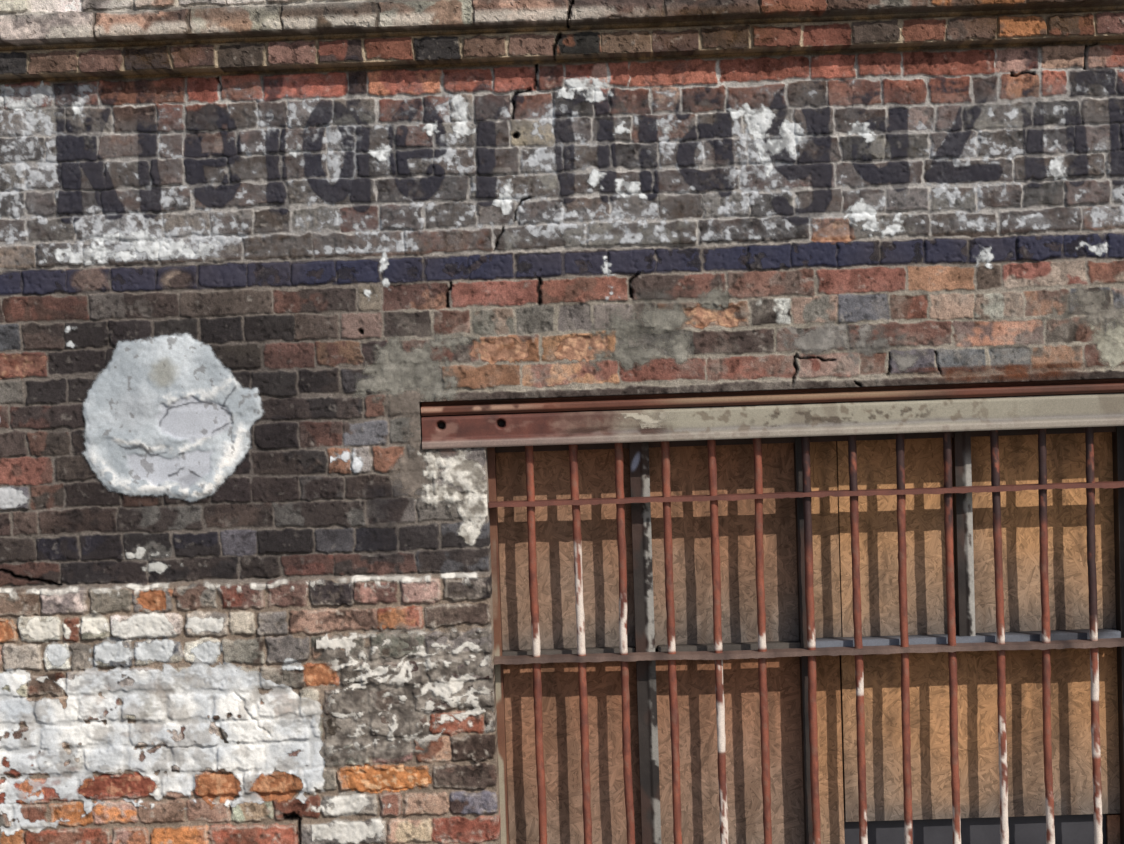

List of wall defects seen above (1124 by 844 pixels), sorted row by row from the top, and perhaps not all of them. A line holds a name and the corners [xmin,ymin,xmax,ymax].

crack [511,0,574,119]
peeling [424,123,439,136]
crack [494,197,531,251]
spalling [811,218,855,244]
crack [792,355,835,384]
crack [121,444,198,476]
peeling [418,448,488,545]
crack [0,569,62,586]
peeling [0,616,337,836]